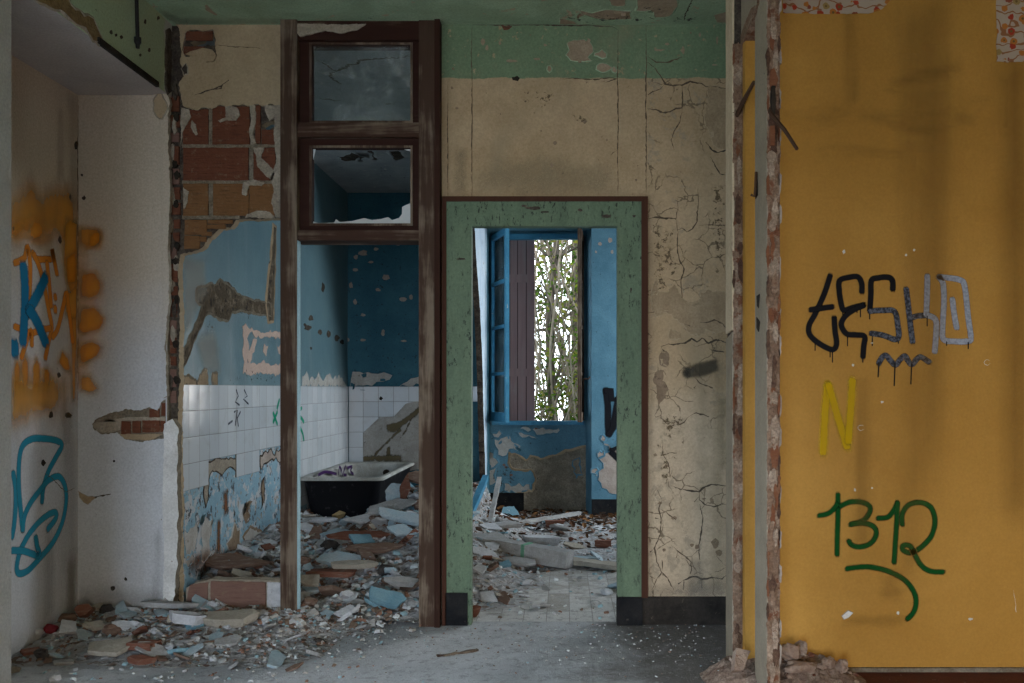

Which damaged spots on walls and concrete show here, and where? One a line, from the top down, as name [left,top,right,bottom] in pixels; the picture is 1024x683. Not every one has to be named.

peeling [566,39,617,74]
crack [645,50,726,171]
flaking render [93,16,280,441]
crack [649,196,725,294]
crack [661,319,726,352]
peeling [183,448,280,570]
peeling [363,402,419,471]
peeling [490,425,561,493]
peeling [572,434,617,495]
crack [650,376,725,590]